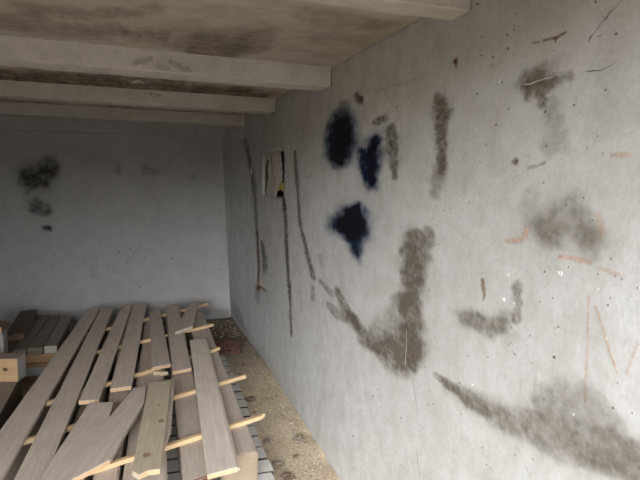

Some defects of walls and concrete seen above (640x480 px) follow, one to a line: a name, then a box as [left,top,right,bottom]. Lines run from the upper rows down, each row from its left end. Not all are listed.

leakage [523,70,553,105]
leakage [20,159,59,189]
leakage [358,148,367,175]
leakage [373,116,397,179]
leakage [435,96,449,174]
leakage [294,151,316,279]
leakage [283,199,292,335]